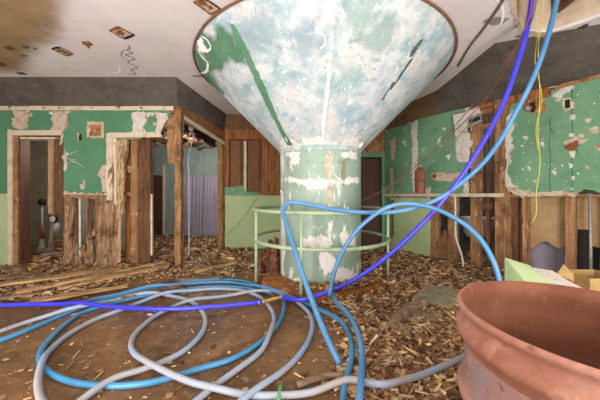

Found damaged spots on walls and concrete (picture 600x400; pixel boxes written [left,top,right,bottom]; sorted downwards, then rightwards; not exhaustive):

damp [0,0,56,75]
peeling [526,85,575,112]
peeling [11,110,33,130]
peeling [131,111,168,132]
peeling [49,110,70,172]
peeling [388,120,461,194]
peeling [446,132,474,162]
peeling [505,109,531,198]
corrosion [564,136,590,151]
peeling [96,165,107,196]
peeling [280,136,363,284]